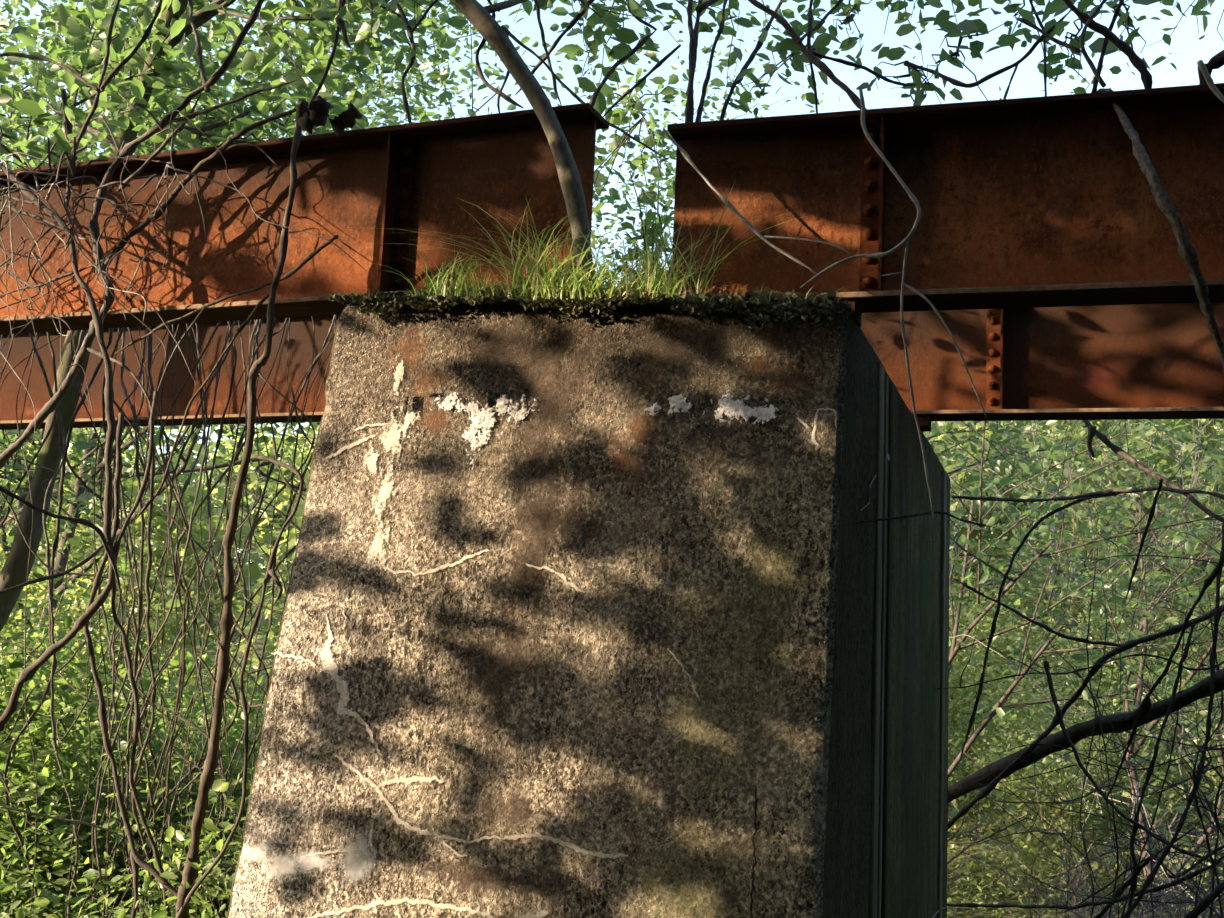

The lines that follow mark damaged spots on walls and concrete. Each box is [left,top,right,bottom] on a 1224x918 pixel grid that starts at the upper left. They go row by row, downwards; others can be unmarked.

peeling [434,390,539,470]
peeling [645,390,779,426]
crack [749,788,757,918]